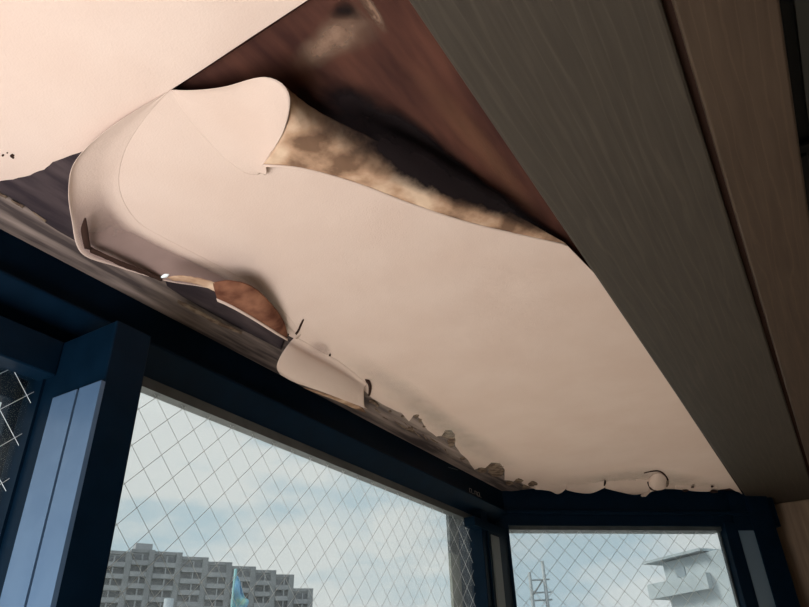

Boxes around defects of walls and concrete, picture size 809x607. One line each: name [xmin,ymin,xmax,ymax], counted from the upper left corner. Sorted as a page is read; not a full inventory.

leakage [322,88,538,227]
spalling [161,274,285,350]
spalling [375,408,538,489]